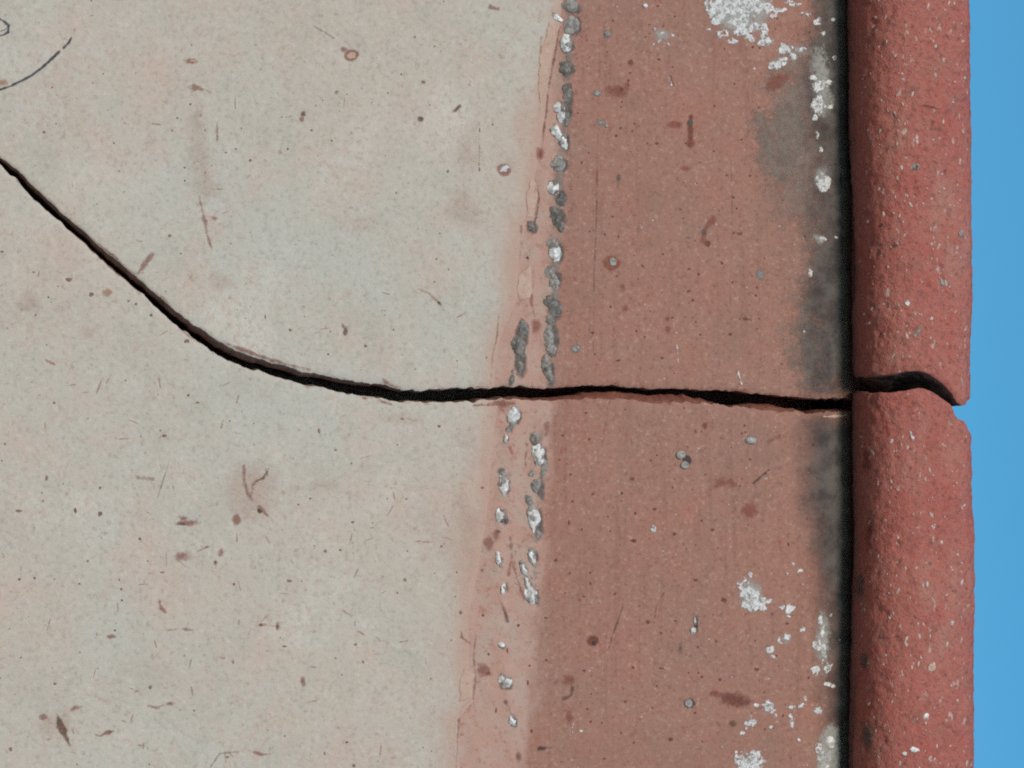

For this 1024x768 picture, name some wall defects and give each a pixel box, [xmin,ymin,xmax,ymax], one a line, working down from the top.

crack [0,158,852,418]
water stain [755,0,853,386]
water stain [809,420,854,768]